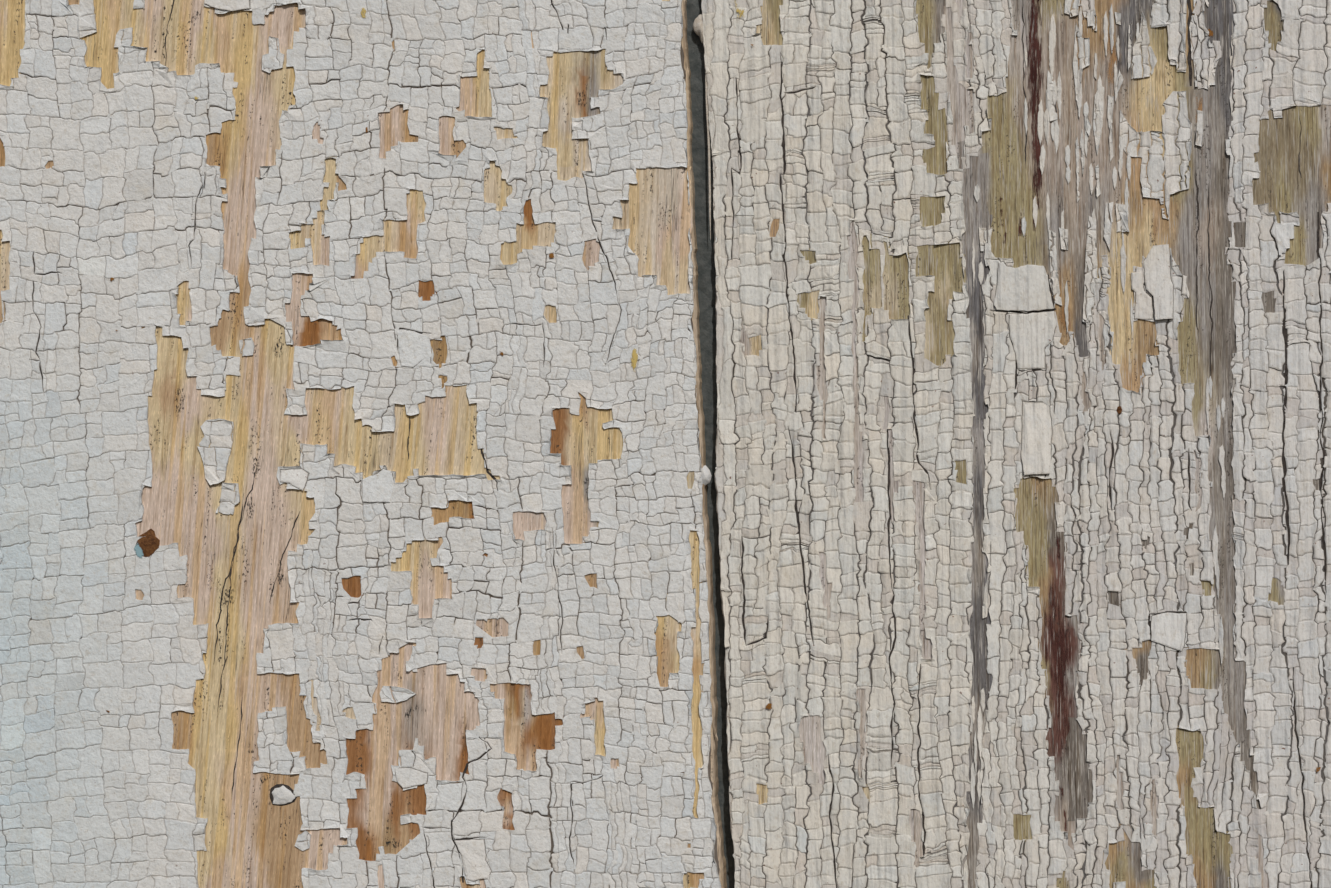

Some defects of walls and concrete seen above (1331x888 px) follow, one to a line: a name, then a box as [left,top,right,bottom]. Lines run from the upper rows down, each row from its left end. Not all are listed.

peeling [68,0,564,888]
peeling [539,49,624,181]
peeling [550,392,625,546]
peeling [582,166,693,296]
crack [779,52,816,641]
crack [990,275,1056,389]
peeling [847,0,1261,888]
peeling [1251,102,1331,267]
crack [1282,212,1327,600]
crack [887,315,931,855]
crack [424,737,492,888]
crack [1288,667,1312,888]